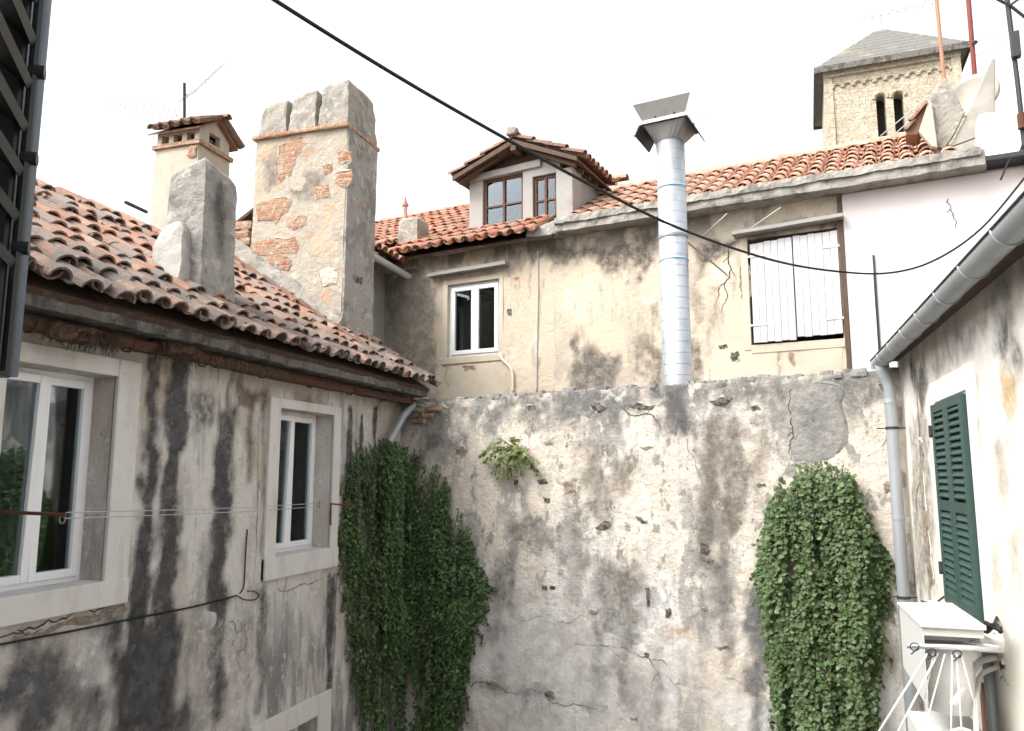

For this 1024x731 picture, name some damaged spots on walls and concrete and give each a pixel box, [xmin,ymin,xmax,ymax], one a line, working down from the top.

flaking render [250,136,311,270]
flaking render [314,147,364,200]
leakage [540,234,655,280]
crack [716,248,734,312]
leakage [570,337,618,390]
spalling [590,402,606,414]
spalling [624,401,656,410]
crack [787,390,795,461]
spalling [789,380,849,462]
leakage [0,356,266,731]
crack [0,599,129,638]
crack [497,614,749,696]